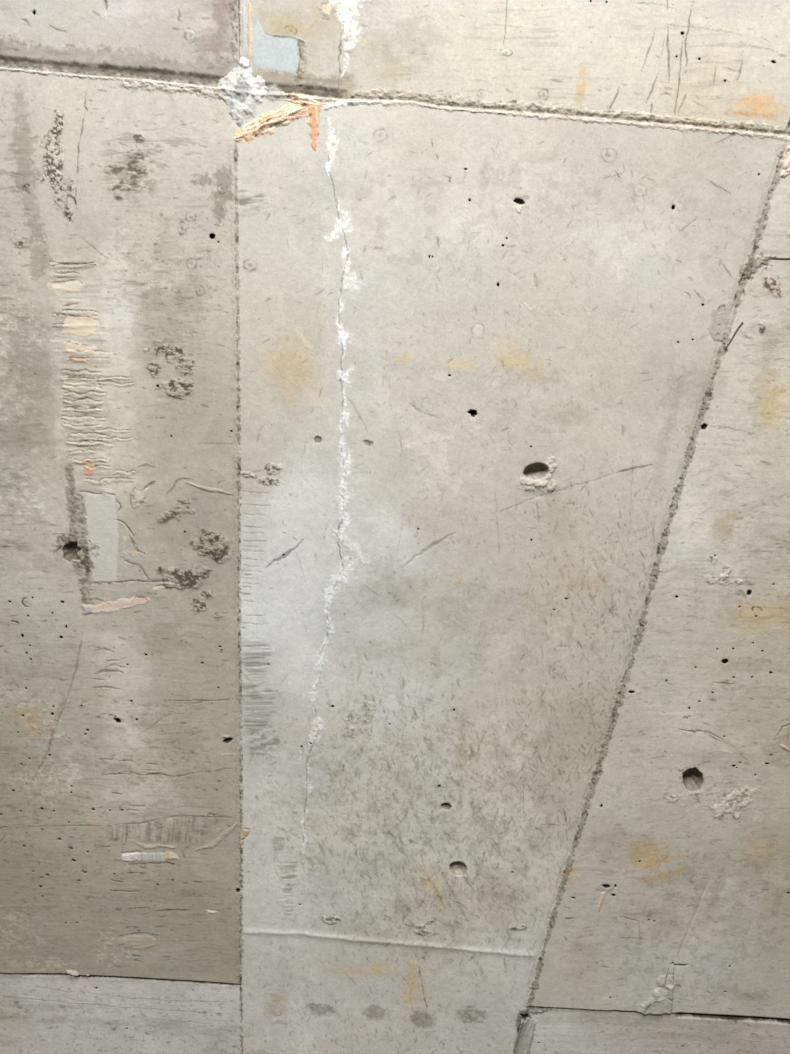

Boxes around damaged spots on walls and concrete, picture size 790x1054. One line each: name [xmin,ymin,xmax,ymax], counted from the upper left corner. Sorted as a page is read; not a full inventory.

crack [265,33,302,78]
crack [337,0,382,89]
crack [324,115,341,186]
damp [225,128,390,746]
crack [320,499,372,606]